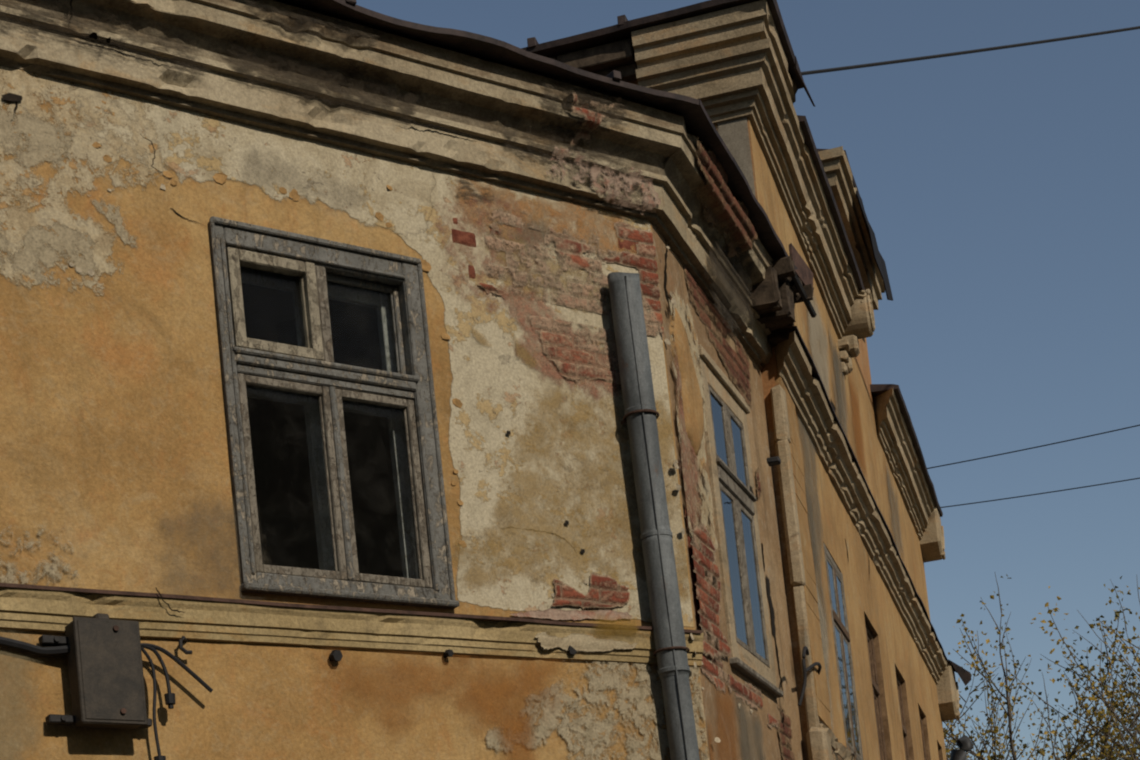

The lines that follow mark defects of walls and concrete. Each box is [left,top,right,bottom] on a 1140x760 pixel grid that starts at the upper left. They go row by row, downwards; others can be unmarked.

leakage [0,0,206,75]
crack [69,0,183,64]
leakage [247,0,381,47]
leakage [229,31,418,121]
leakage [504,75,642,203]
flaking render [0,66,795,760]